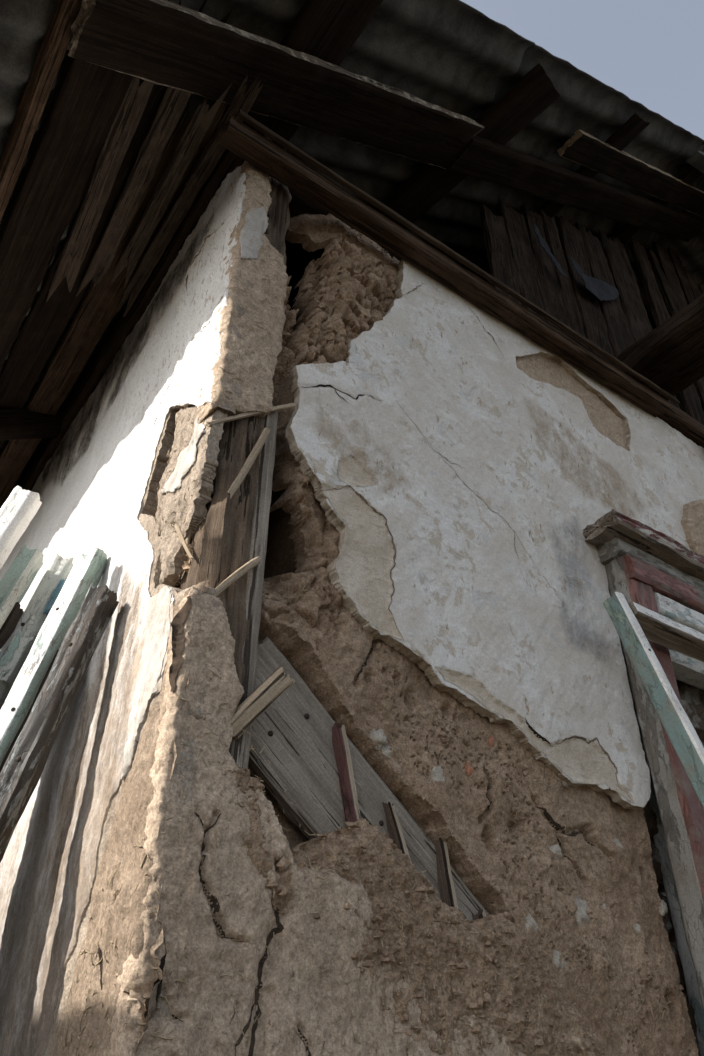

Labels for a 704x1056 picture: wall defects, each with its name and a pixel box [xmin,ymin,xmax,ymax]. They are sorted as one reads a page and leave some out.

water stain [43,225,208,482]
crack [301,384,375,404]
water stain [56,576,138,857]
spalling [53,405,228,1056]
spalling [224,206,699,1056]
crack [77,930,184,1050]
crack [195,813,284,1056]